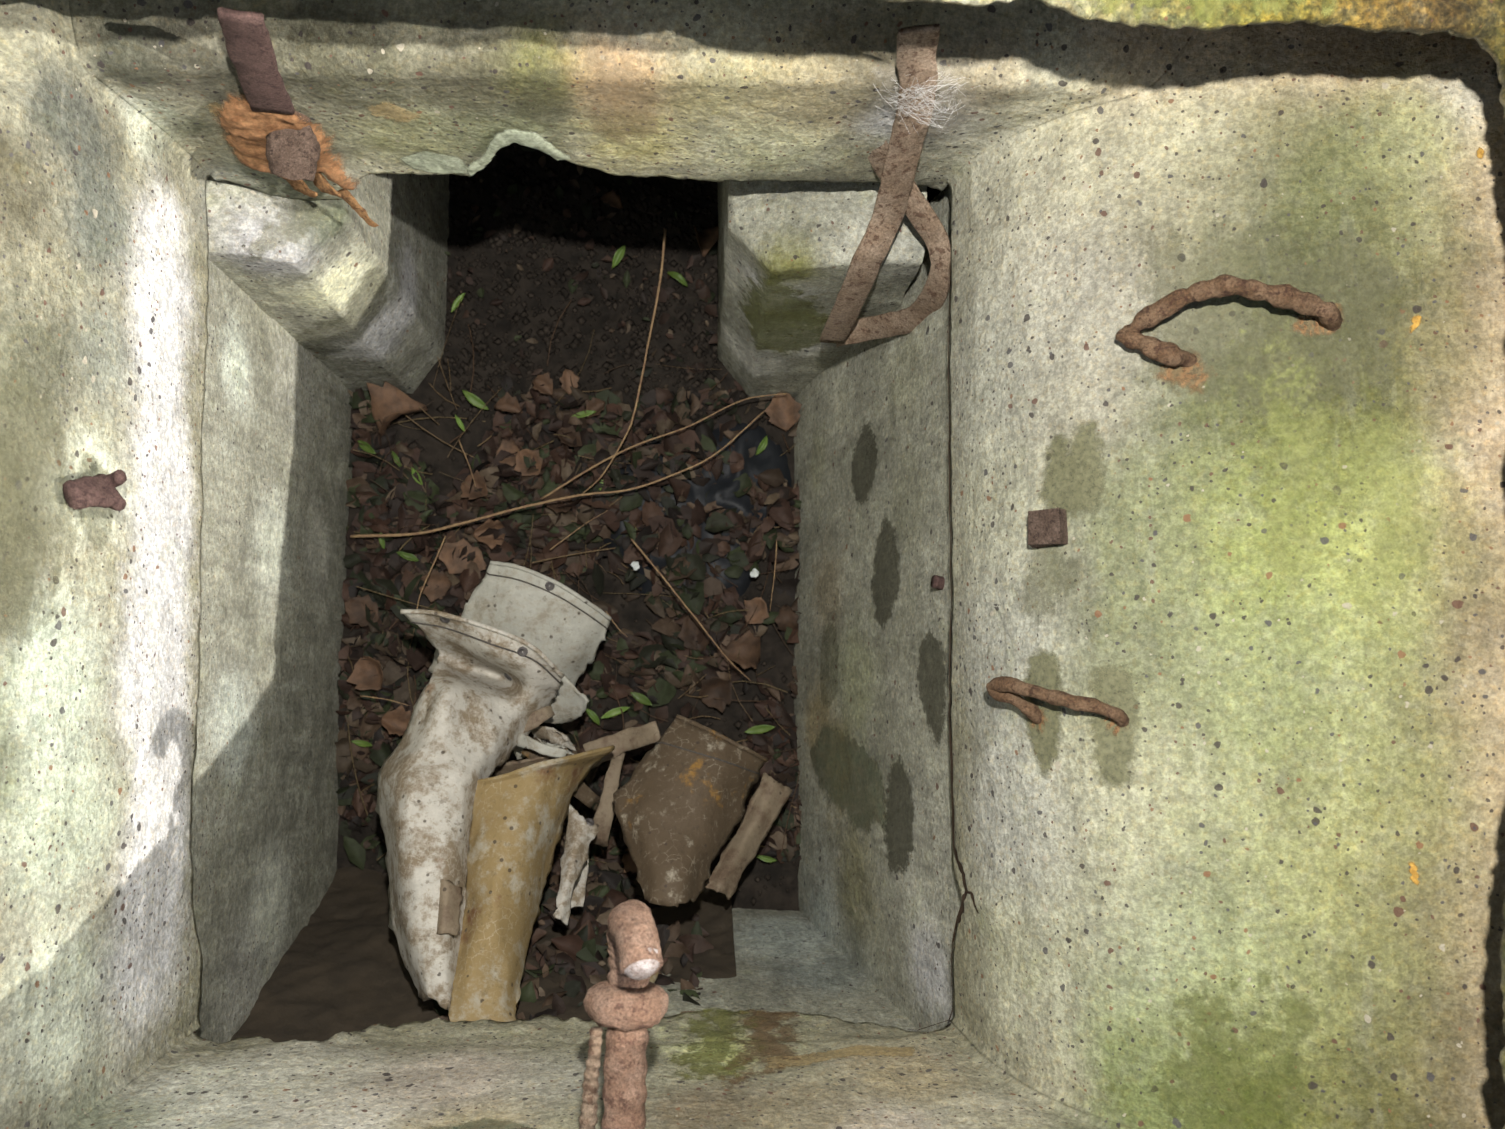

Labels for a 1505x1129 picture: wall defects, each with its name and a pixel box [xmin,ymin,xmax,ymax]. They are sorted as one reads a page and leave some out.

corrosion [1157,351,1208,391]
corrosion [1292,304,1343,335]
water stain [851,421,878,504]
water stain [1039,422,1105,516]
water stain [870,517,900,629]
water stain [917,629,948,744]
crack [907,284,978,1031]
water stain [1024,652,1062,775]
water stain [1089,666,1140,787]
water stain [810,726,915,874]
water stain [1408,862,1420,885]